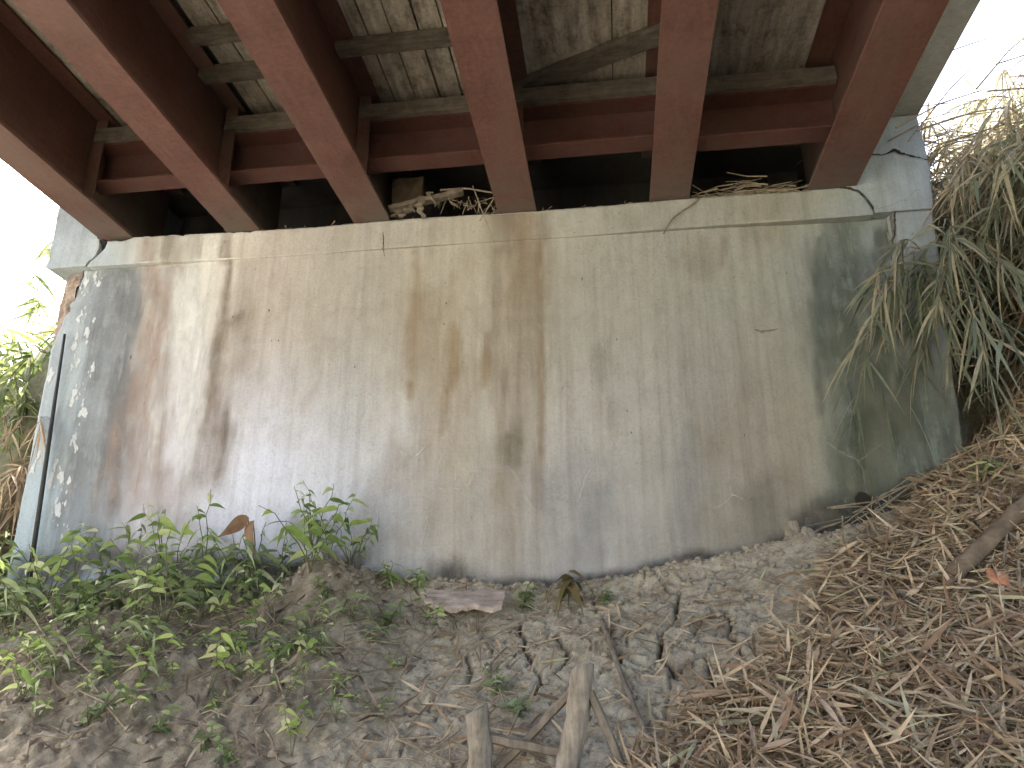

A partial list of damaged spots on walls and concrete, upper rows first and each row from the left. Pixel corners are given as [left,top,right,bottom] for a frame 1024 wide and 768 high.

crack [872,148,928,160]
crack [840,187,874,210]
peeling [54,270,102,453]
peeling [47,458,71,540]
leakage [798,494,867,534]